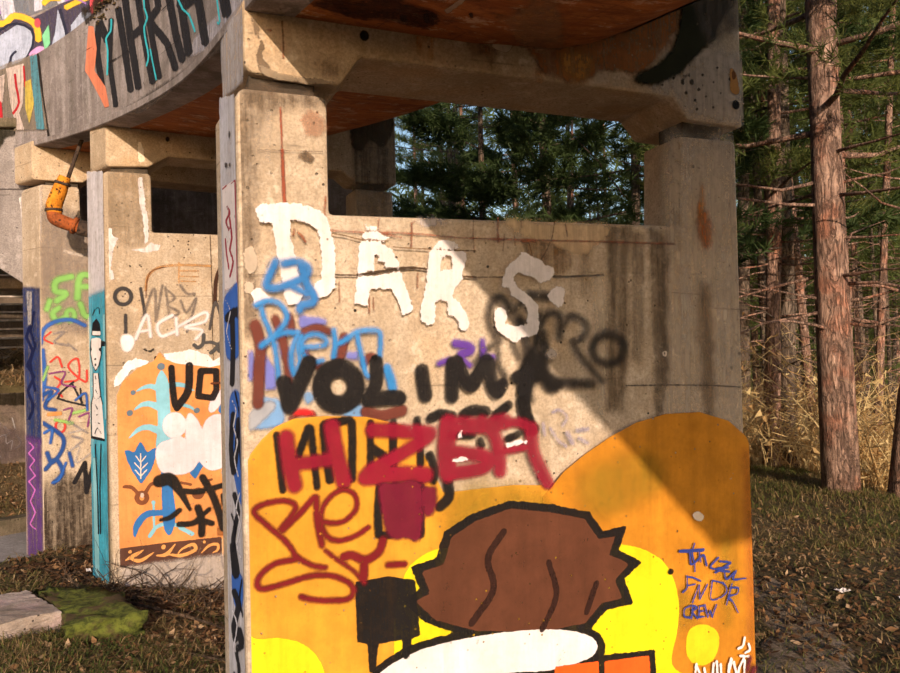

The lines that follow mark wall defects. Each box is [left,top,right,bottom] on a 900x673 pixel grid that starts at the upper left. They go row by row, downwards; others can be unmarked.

leakage [507,219,668,412]
corrosion [698,202,711,247]